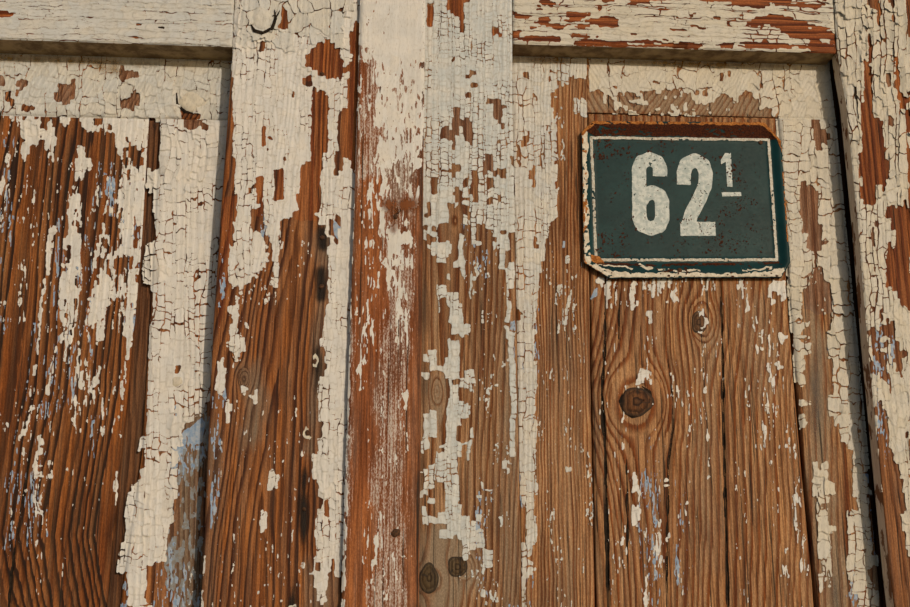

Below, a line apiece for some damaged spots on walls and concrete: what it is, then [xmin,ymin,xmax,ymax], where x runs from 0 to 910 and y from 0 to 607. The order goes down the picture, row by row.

crack [0,0,280,68]
crack [176,93,192,113]
crack [853,86,861,124]
corrosion [581,121,782,277]
peeling [453,233,490,299]
peeling [590,277,687,324]
peeling [625,336,657,389]
peeling [4,401,54,546]
peeling [259,441,288,491]
peeling [420,274,503,605]
peeling [608,468,690,607]
peeling [785,461,836,593]